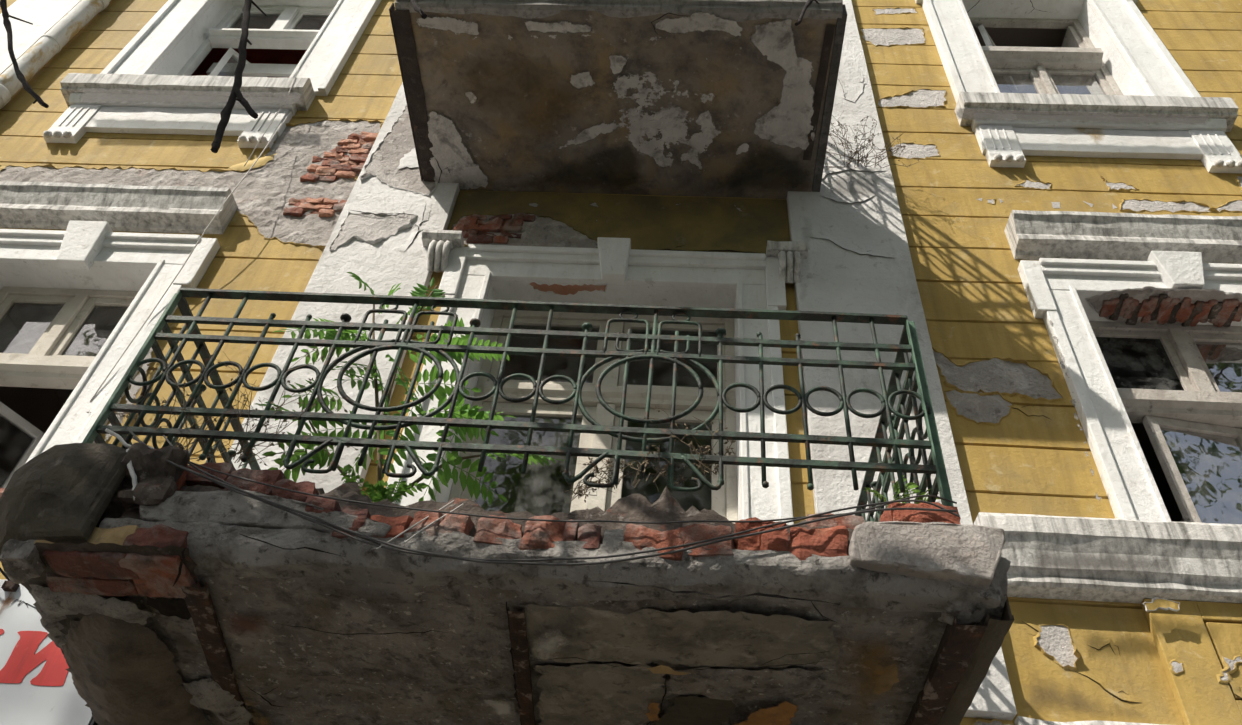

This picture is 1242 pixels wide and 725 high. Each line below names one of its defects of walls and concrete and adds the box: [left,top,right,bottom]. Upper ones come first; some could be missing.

peeling [859,7,927,47]
peeling [558,55,725,171]
peeling [646,11,815,155]
peeling [876,89,947,109]
flaking render [0,105,489,251]
flaking render [450,203,598,248]
peeling [1100,175,1242,213]
spalling [100,348,191,521]
crack [506,580,839,725]
crack [1022,618,1042,636]
peeling [1033,624,1081,670]
crack [1075,638,1142,703]